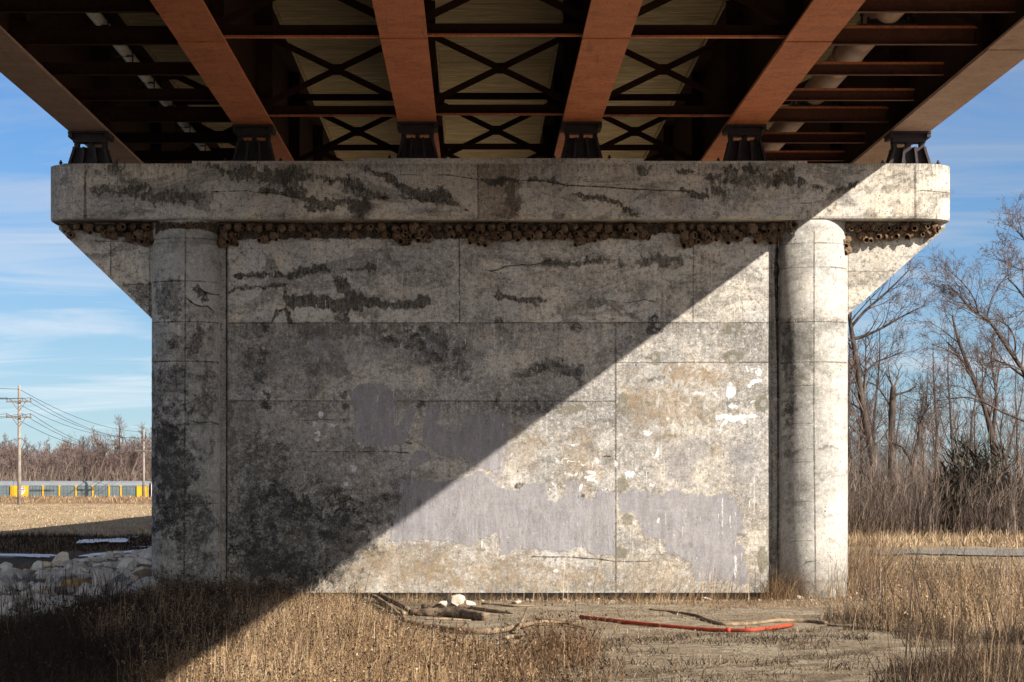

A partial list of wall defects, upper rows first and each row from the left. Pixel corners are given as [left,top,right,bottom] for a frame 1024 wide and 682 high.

water stain [85,159,218,211]
water stain [197,159,468,221]
water stain [571,192,640,217]
crack [518,176,709,200]
water stain [675,162,859,201]
water stain [586,247,683,269]
crack [187,284,219,310]
water stain [492,279,547,305]
water stain [228,243,479,391]
water stain [513,355,583,388]
peeling [681,367,762,431]
water stain [151,321,384,592]